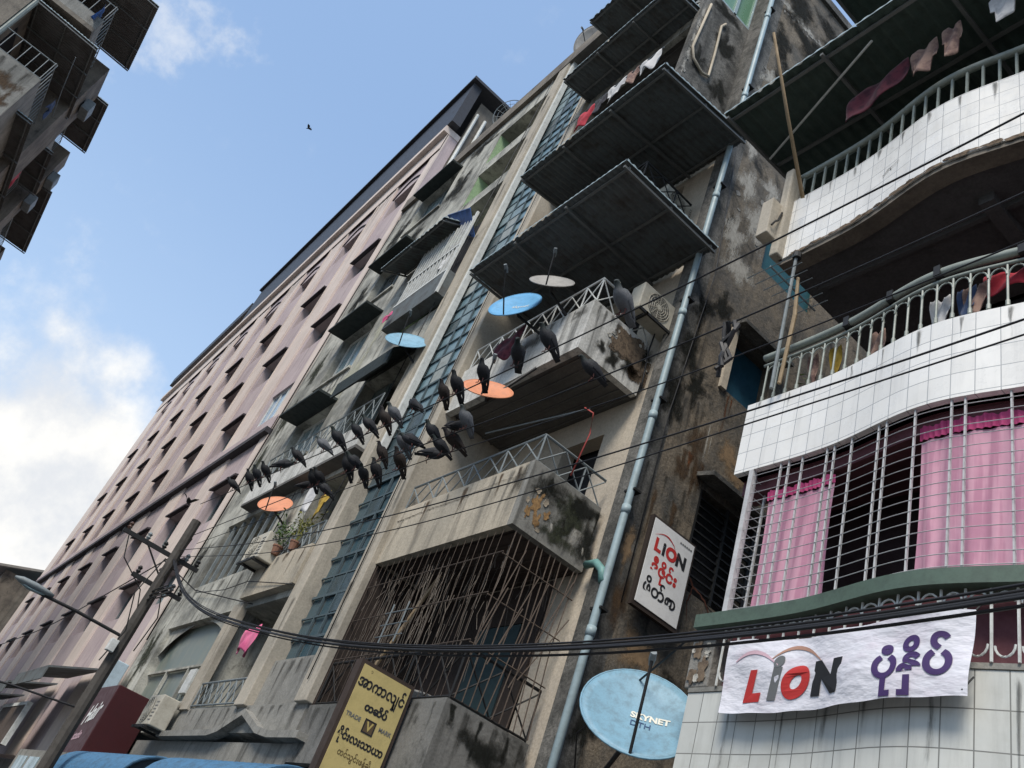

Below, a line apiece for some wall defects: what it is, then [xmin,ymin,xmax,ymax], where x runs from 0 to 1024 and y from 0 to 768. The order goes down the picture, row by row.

damp [715,0,739,60]
damp [692,45,706,72]
damp [708,80,726,104]
damp [597,340,651,379]
flaking render [524,488,550,533]
damp [533,472,600,561]
flaking render [686,641,711,685]